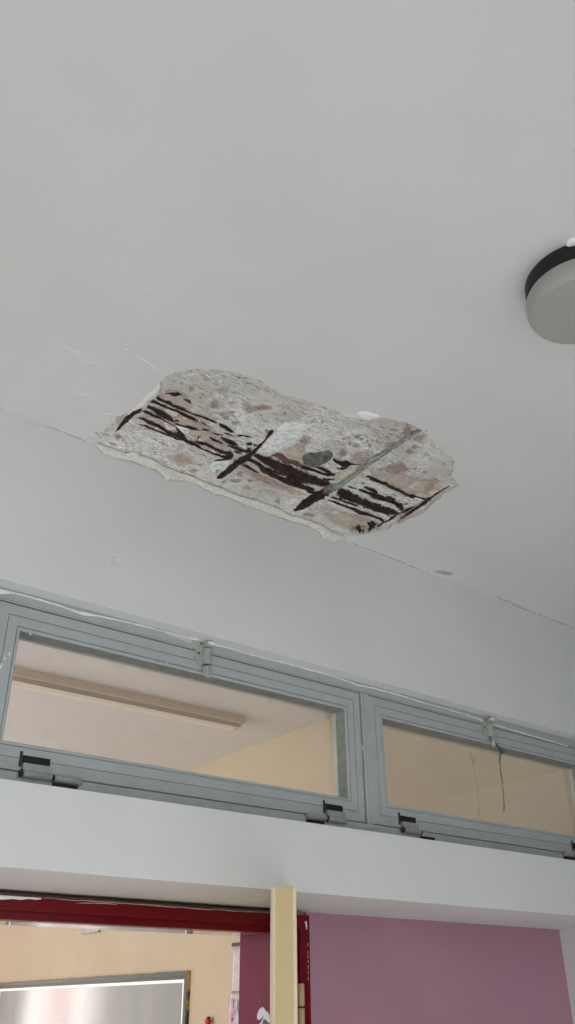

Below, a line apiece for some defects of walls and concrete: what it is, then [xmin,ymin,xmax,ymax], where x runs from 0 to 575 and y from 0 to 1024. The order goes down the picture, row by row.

spalling [88,368,458,542]
corrosion [139,389,438,534]